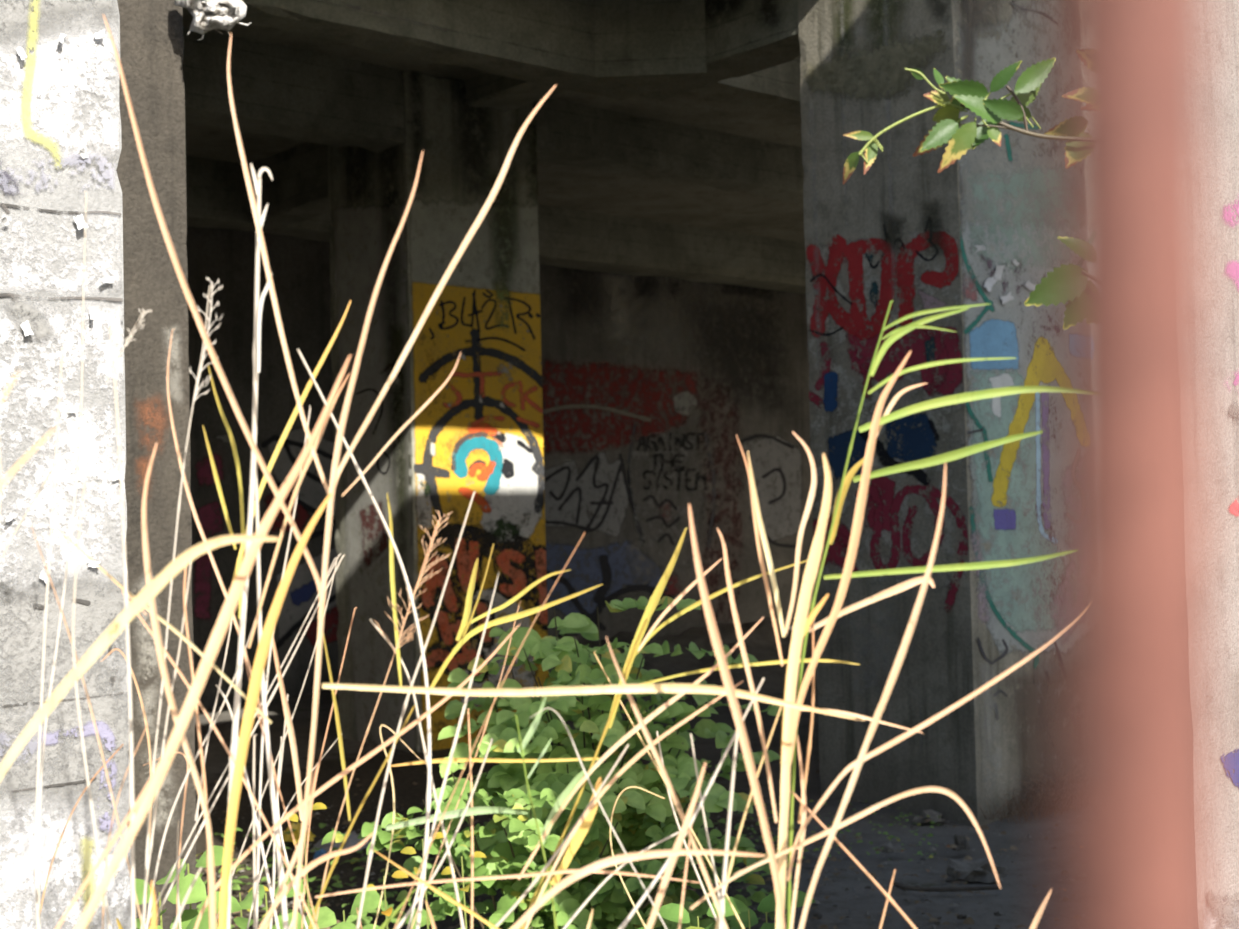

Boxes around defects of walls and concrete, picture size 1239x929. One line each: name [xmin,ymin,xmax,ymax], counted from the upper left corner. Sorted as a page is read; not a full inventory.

water stain [930,0,999,81]
peeling [963,234,1054,344]